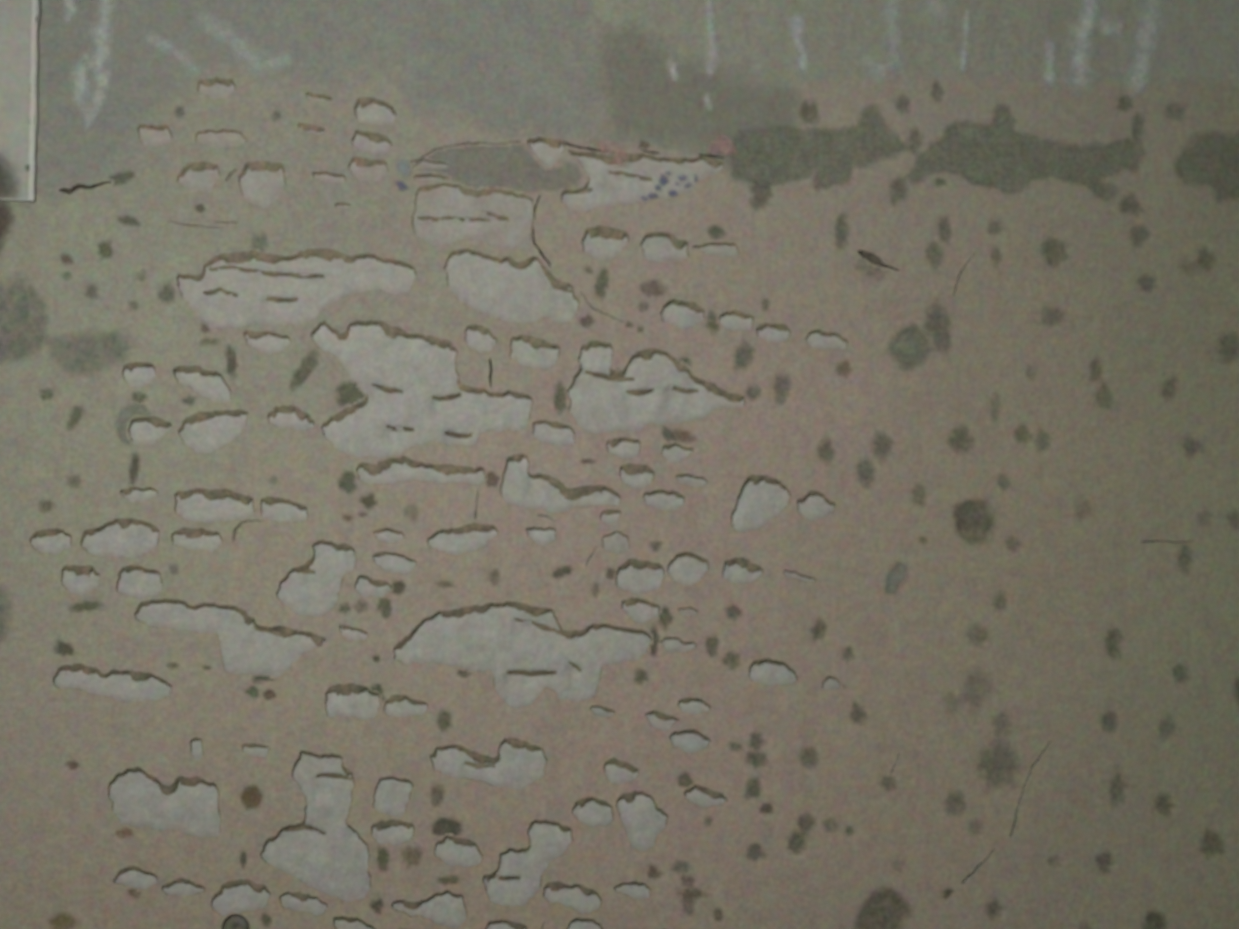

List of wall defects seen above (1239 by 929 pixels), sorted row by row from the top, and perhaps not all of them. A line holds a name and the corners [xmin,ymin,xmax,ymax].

spalling [527,137,724,213]
spalling [120,348,249,503]
spalling [163,158,764,720]
spalling [30,488,417,703]
spalling [749,658,798,687]
spalling [108,750,668,929]
spalling [430,738,547,790]
crack [962,741,1051,884]